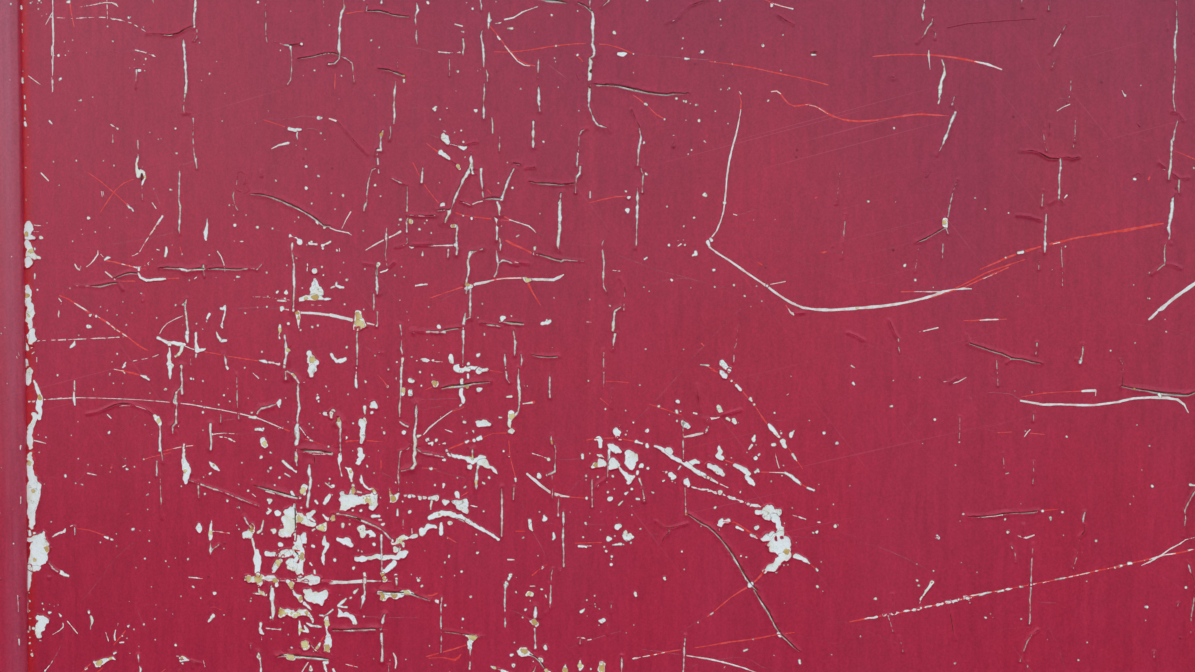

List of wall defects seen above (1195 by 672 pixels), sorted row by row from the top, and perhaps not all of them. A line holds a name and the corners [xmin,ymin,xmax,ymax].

crack [912,93,961,262]
crack [1149,0,1193,278]
peeling [23,219,69,577]
peeling [277,266,345,340]
peeling [176,398,503,672]
crack [73,0,694,543]
crack [247,430,596,672]
peeling [580,426,649,503]
peeling [664,404,761,495]
crack [639,485,804,672]
peeling [717,502,819,583]
crack [1116,370,1195,401]